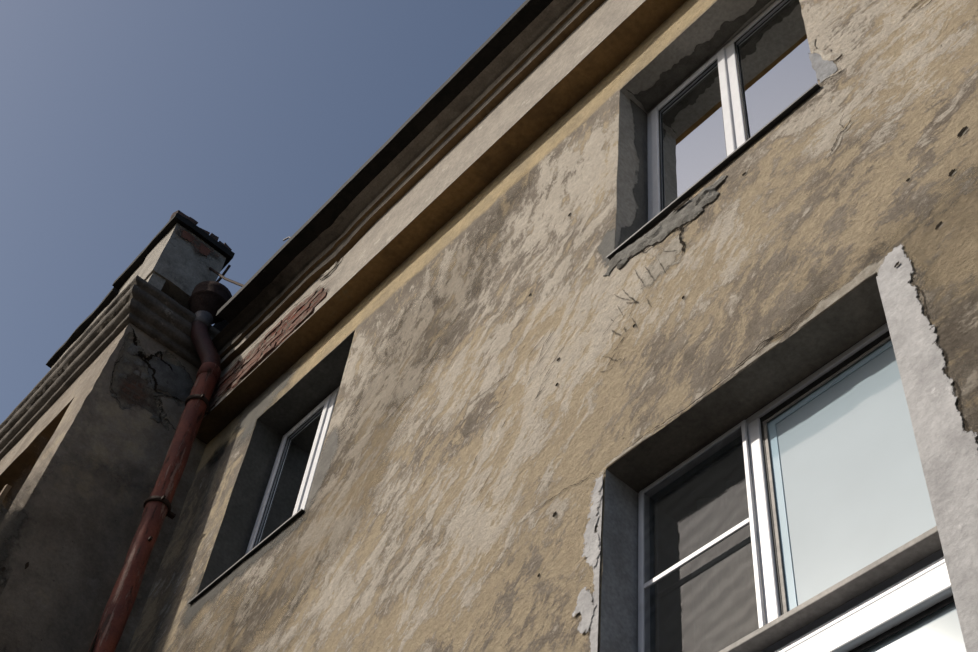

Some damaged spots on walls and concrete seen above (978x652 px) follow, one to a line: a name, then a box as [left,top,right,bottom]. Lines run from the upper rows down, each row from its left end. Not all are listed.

flaking render [603,175,728,289]
flaking render [110,327,193,431]
flaking render [204,278,333,415]
flaking render [534,258,901,652]